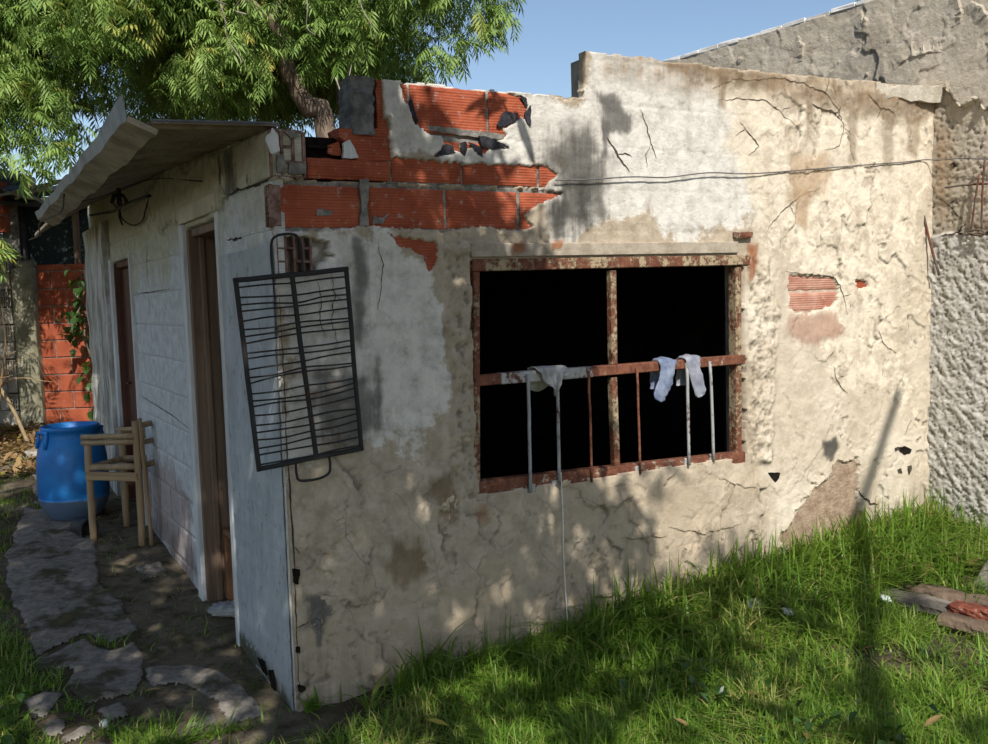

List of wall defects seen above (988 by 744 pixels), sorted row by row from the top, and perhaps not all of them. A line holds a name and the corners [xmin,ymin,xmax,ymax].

flaking render [246,84,560,273]
crack [608,111,656,172]
crack [714,76,850,155]
flaking render [787,275,843,341]
flaking render [777,447,868,554]